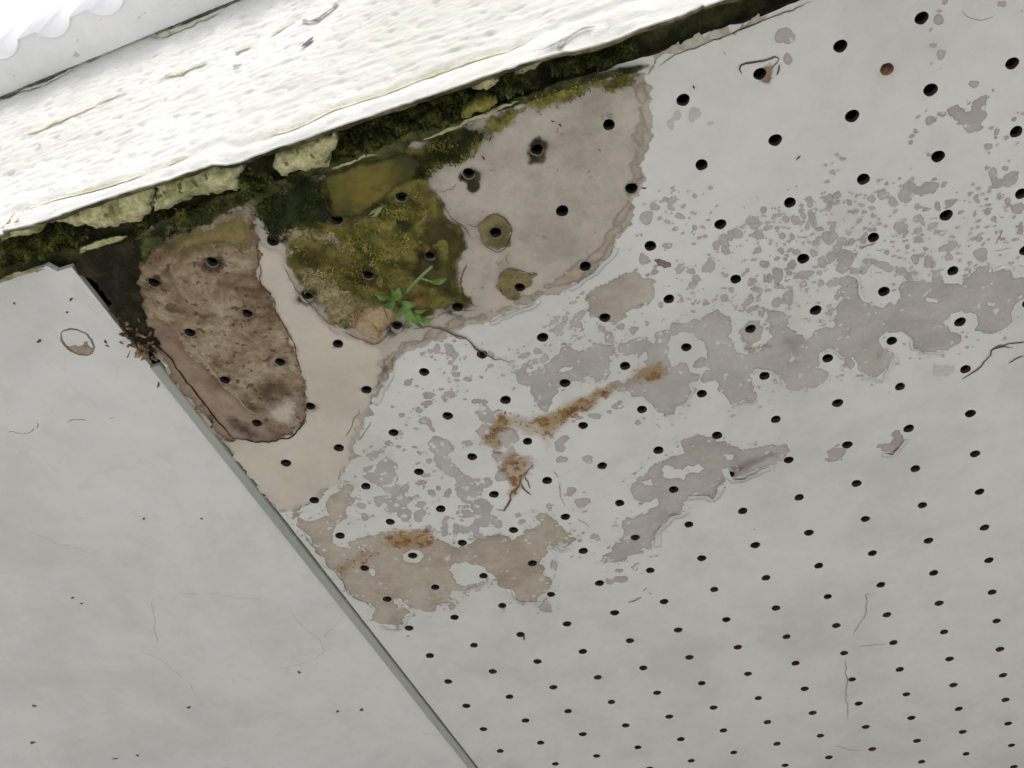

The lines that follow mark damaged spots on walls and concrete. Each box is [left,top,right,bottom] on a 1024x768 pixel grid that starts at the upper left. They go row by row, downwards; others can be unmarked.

peeling [930,0,948,65]
water stain [75,65,649,443]
crack [415,326,510,365]
peeling [153,73,1024,637]
crack [963,342,1024,379]
corrosion [486,391,608,493]
corrosion [386,530,432,549]